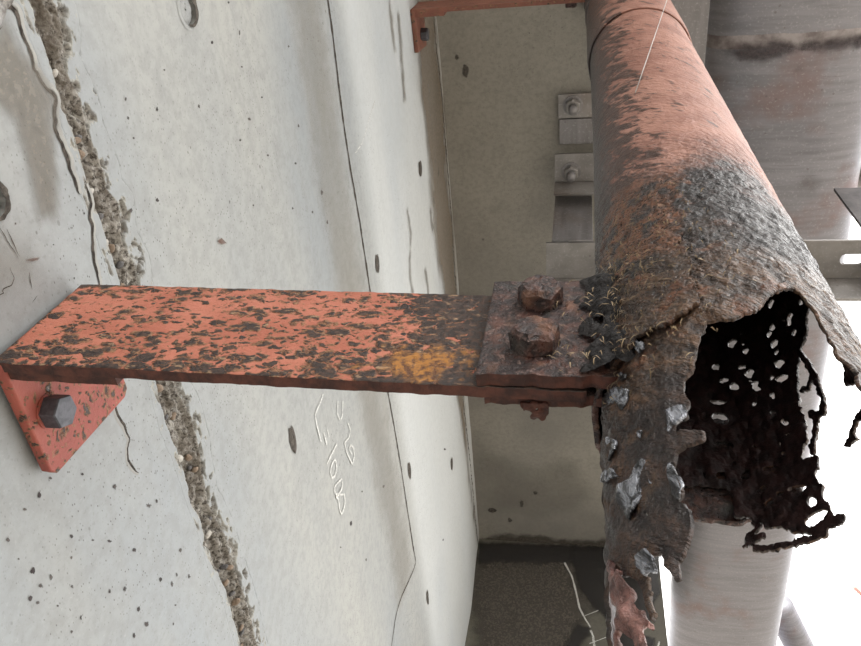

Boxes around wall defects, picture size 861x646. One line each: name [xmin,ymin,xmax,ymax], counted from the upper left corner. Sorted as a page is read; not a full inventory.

crack [8,0,154,286]
crack [0,229,37,301]
crack [113,407,139,475]
crack [146,380,268,646]
peeling [667,462,684,500]